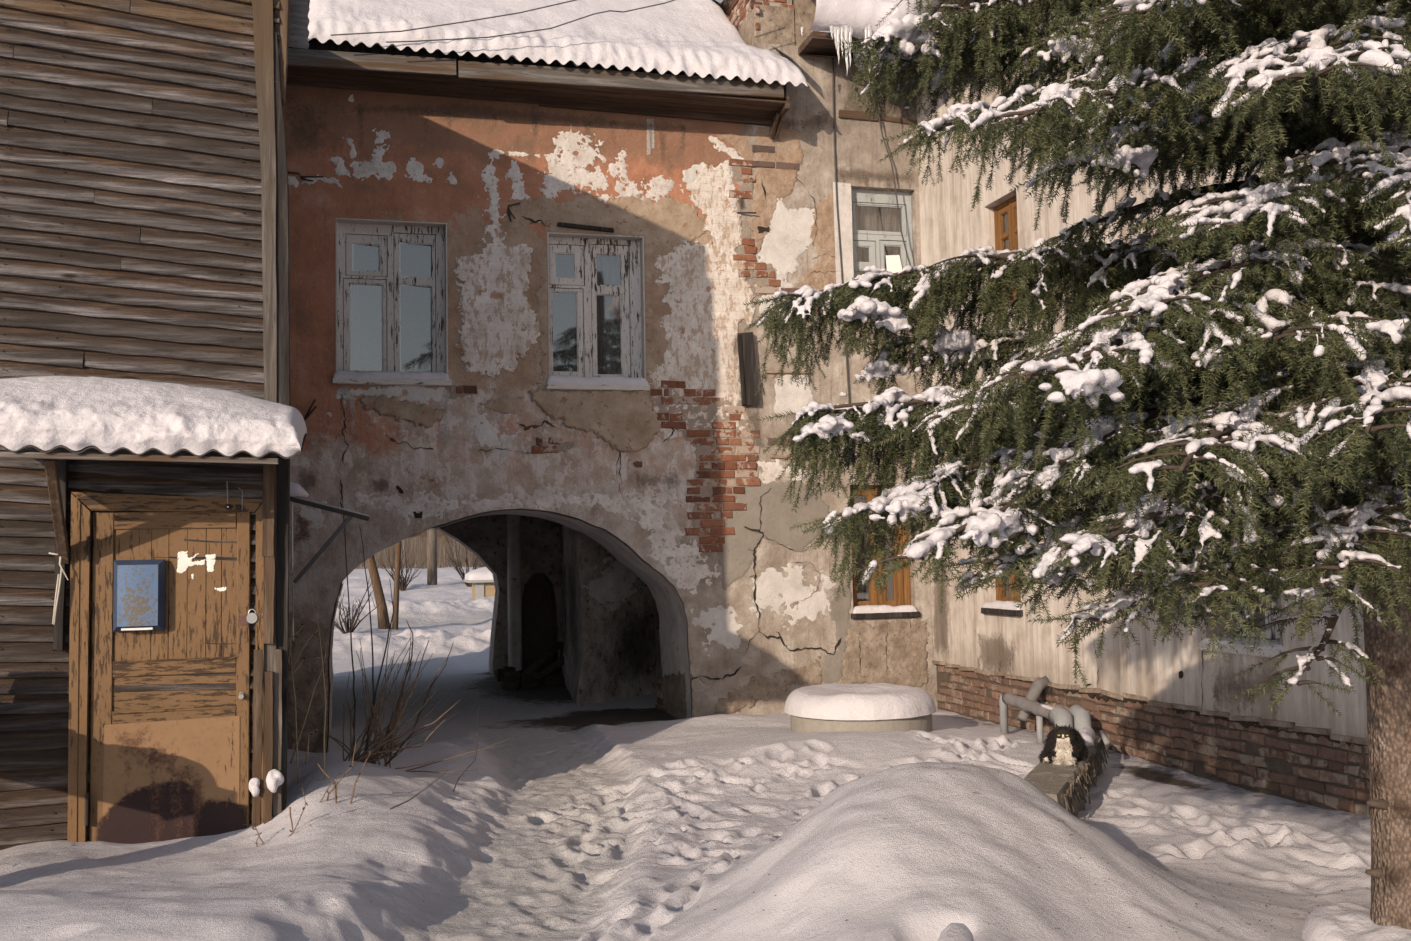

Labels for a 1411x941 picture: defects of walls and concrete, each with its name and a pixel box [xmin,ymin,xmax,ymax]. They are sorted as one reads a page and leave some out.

peeling [288,128,457,188]
peeling [327,124,836,656]
crack [478,420,559,454]
peeling [294,500,327,534]
crack [690,488,912,717]